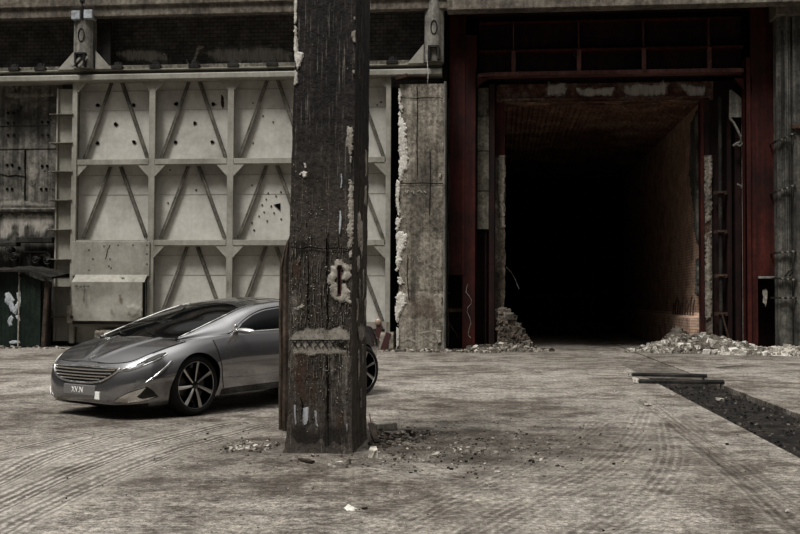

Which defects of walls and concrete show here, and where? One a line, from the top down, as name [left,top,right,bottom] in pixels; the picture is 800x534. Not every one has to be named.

peeling [293,0,304,85]
peeling [547,83,565,95]
peeling [576,82,667,96]
peeling [681,84,705,96]
spalling [395,89,441,349]
spalling [325,149,367,409]
spalling [291,327,349,355]